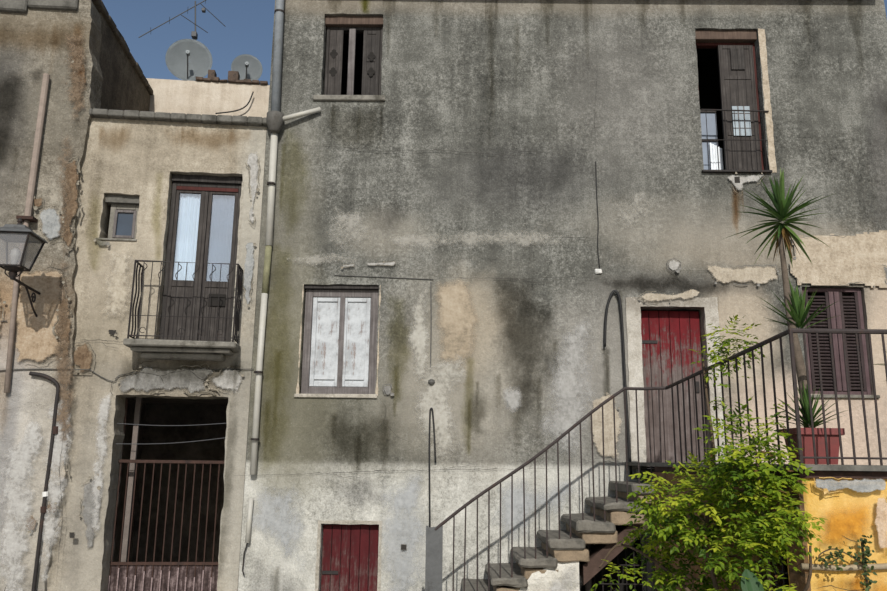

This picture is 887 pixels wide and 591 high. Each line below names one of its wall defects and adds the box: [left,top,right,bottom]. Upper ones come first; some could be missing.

peeling [0,139,95,440]
peeling [708,230,887,288]
peeling [117,362,244,396]
leakage [505,390,520,409]
peeling [592,392,622,461]
peeling [814,477,887,548]